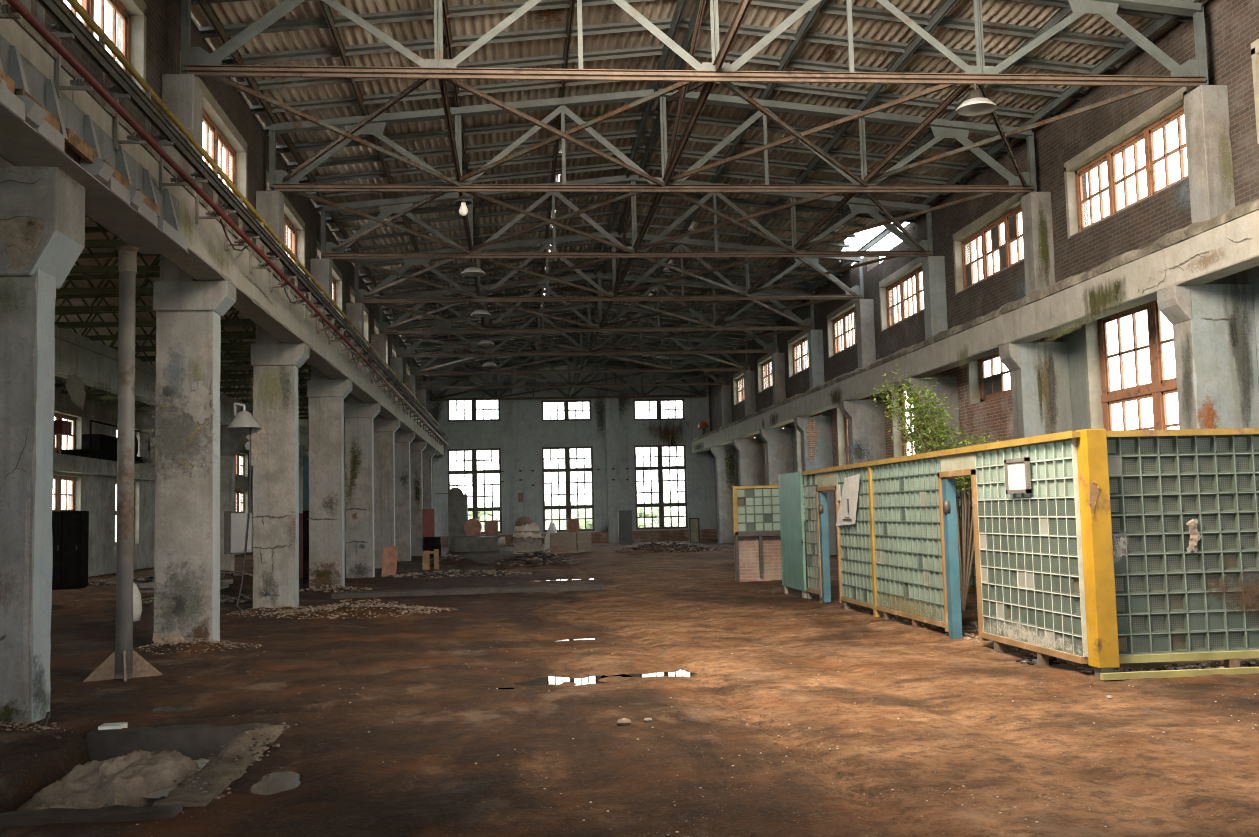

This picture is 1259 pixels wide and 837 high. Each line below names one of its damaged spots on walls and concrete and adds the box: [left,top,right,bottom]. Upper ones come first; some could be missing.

crack [1162,238,1251,272]
damp [1090,282,1119,317]
damp [1230,283,1253,419]
damp [142,348,211,478]
damp [1038,358,1054,420]
rust [1197,401,1217,429]
crack [251,508,368,572]
damp [155,562,203,631]